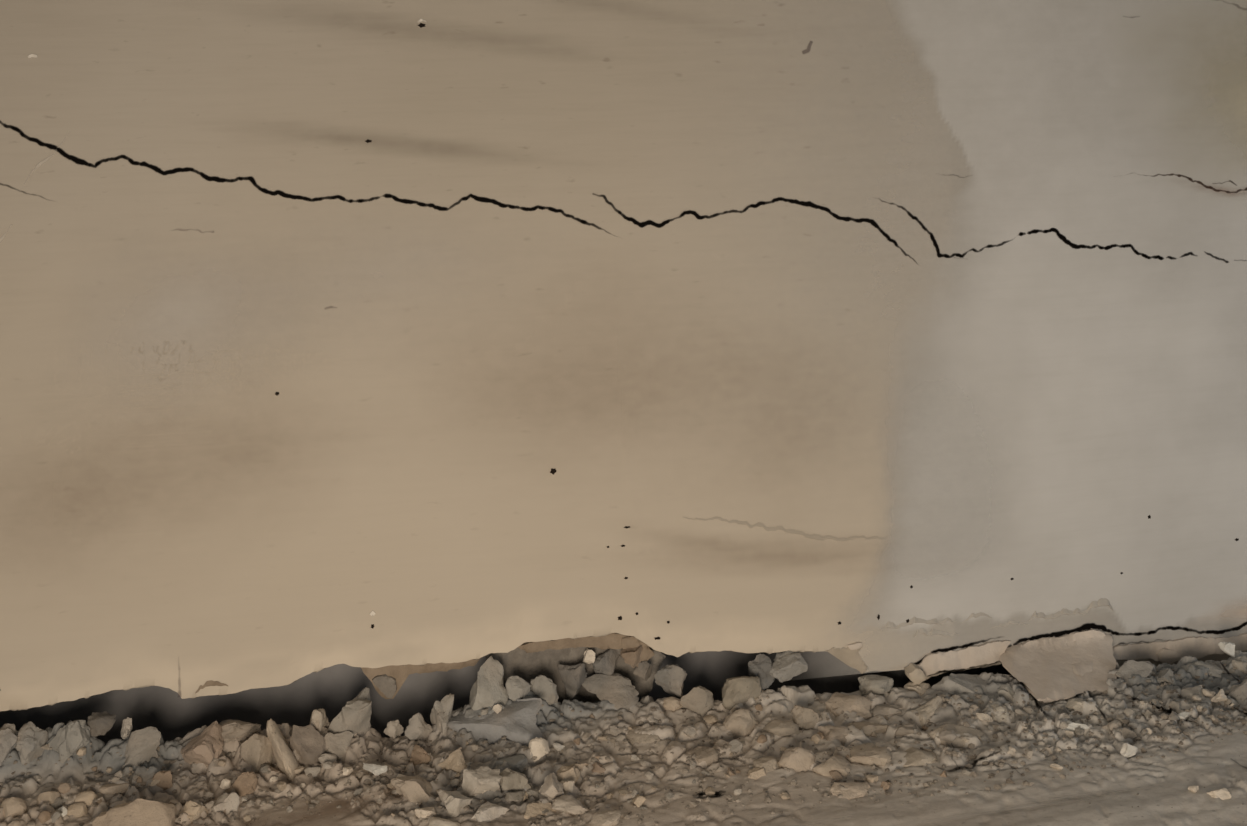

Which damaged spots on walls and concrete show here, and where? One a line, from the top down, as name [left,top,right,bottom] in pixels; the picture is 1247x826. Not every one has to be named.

crack [0,121,1228,263]
crack [1168,174,1247,193]
peeling [195,681,228,694]
spalling [361,633,666,704]
spalling [826,642,869,674]
peeling [904,663,926,684]
flaking render [1000,628,1117,703]
crack [914,622,1247,720]
spalling [1218,642,1247,667]
spalling [1063,721,1089,732]